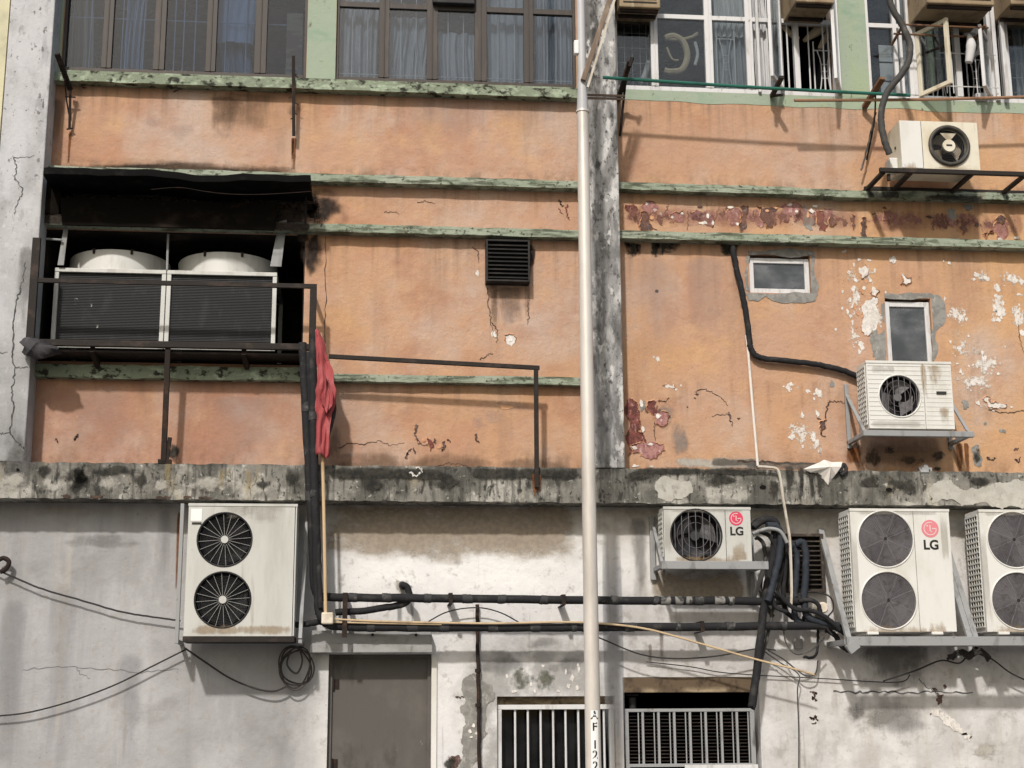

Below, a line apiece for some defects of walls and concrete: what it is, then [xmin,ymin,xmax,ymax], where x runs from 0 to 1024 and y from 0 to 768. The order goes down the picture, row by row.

crack [13,155,34,213]
peeling [624,200,1019,240]
spalling [841,250,887,357]
crack [0,262,27,451]
peeling [624,383,682,461]
crack [687,389,740,426]
crack [818,400,845,437]
damp [2,440,167,492]
damp [473,468,579,479]
damp [627,458,760,486]
damp [328,506,571,557]
peeling [444,673,495,768]